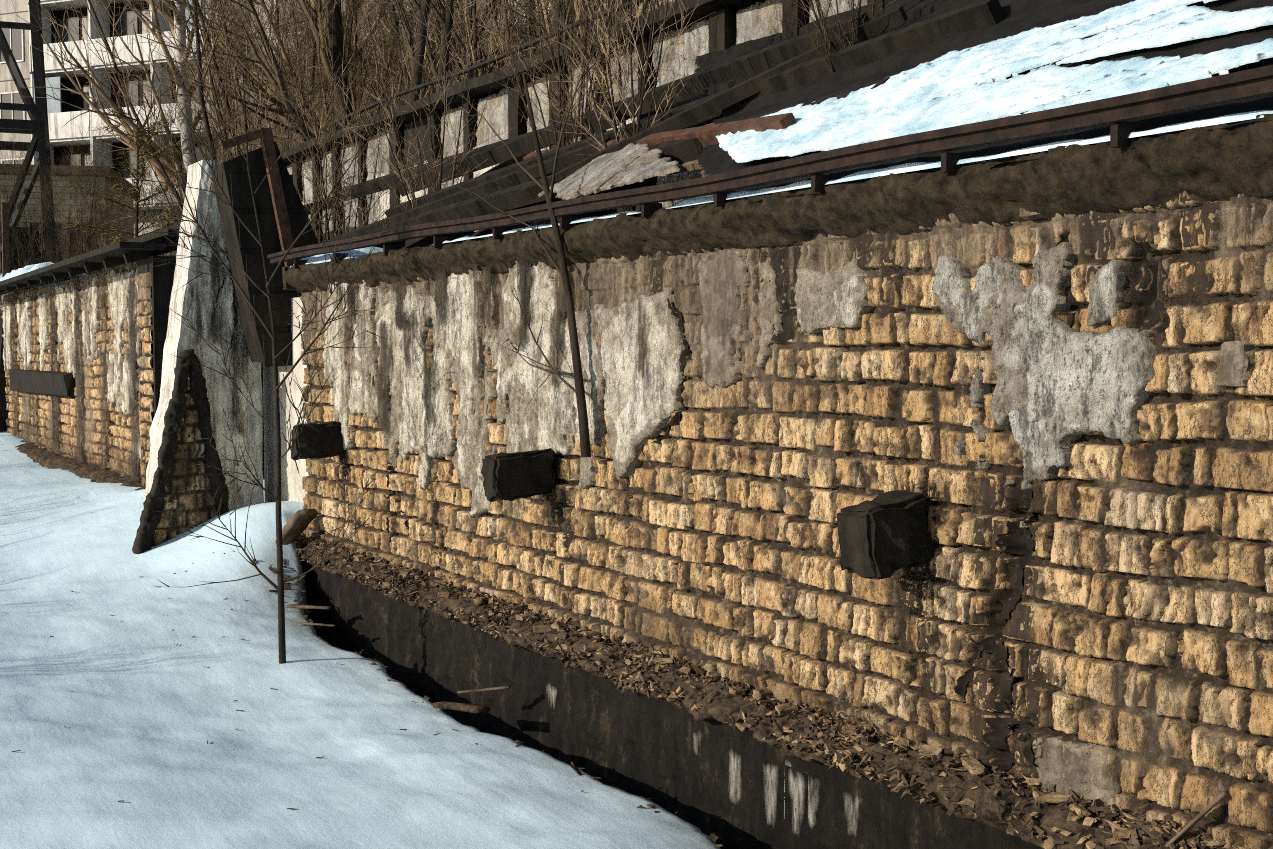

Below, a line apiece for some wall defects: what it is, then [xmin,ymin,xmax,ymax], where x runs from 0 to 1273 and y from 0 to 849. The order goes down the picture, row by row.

flaking render [2,267,140,417]
water stain [375,275,414,432]
flaking render [323,261,686,516]
water stain [516,262,531,348]
water stain [550,258,566,421]
peeling [697,249,874,388]
flaking render [932,235,1173,490]
water stain [1078,211,1119,285]
water stain [1177,190,1267,306]
peeling [1217,340,1254,387]
water stain [541,450,578,607]
peeling [1031,736,1121,811]